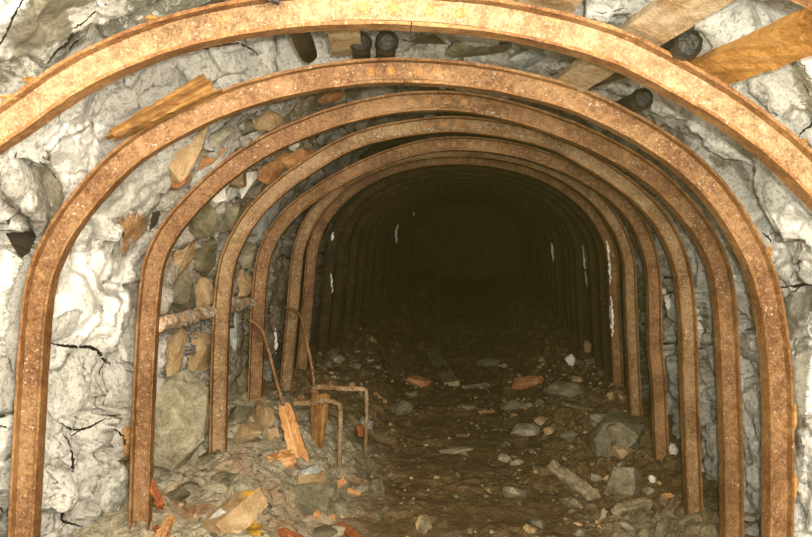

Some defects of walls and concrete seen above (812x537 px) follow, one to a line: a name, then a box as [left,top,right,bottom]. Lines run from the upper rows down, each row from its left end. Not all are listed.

crack [0,0,24,45]
crack [47,0,109,64]
corrosion [791,60,812,120]
corrosion [710,149,732,168]
corrosion [115,210,150,256]
crack [51,342,111,375]
crack [62,418,126,473]
corrosion [122,426,131,468]
crack [60,513,82,527]